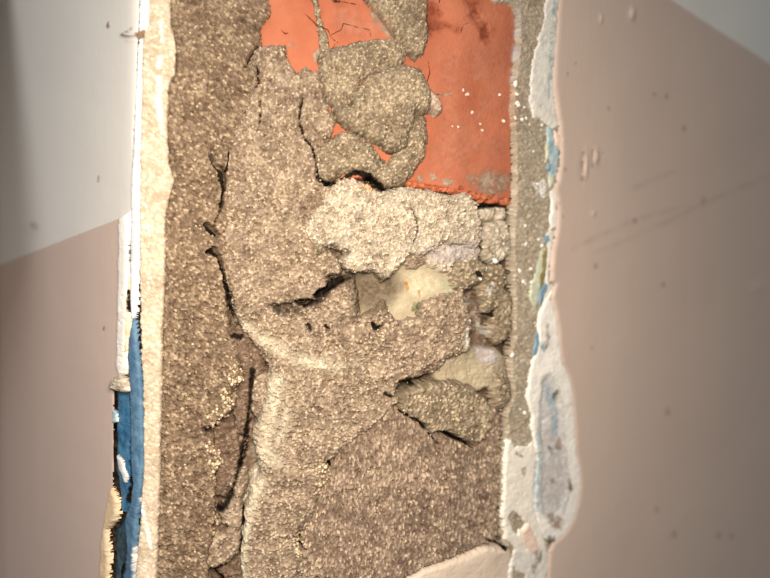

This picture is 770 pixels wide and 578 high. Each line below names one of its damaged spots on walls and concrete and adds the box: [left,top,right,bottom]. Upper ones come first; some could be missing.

crack [209,151,230,208]
crack [299,99,386,191]
crack [476,203,506,217]
crack [203,224,244,340]
peeling [499,0,581,578]
crack [383,374,472,448]
crack [210,367,256,578]